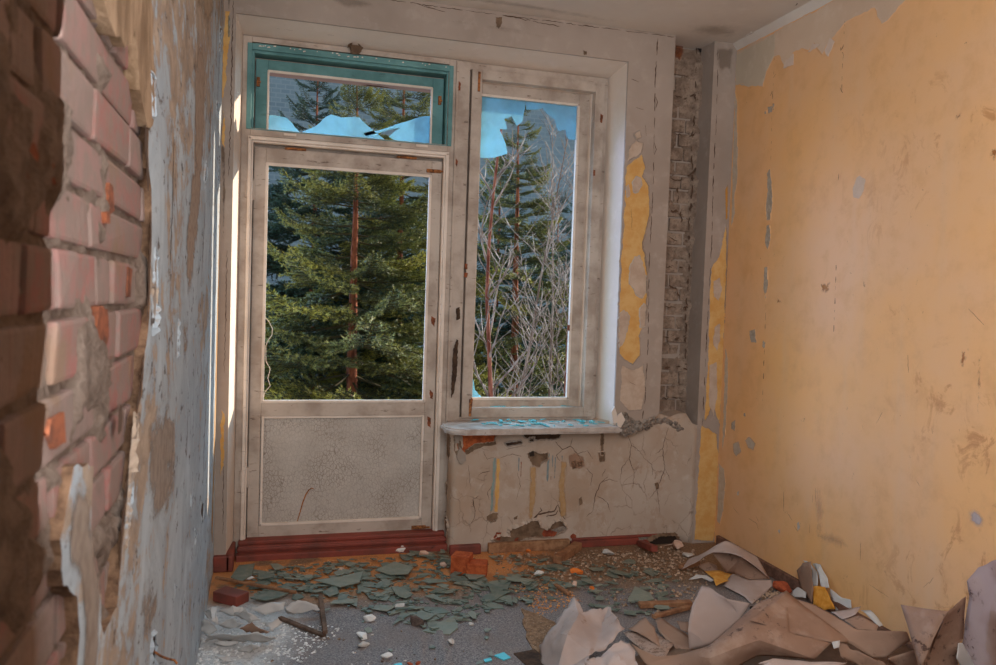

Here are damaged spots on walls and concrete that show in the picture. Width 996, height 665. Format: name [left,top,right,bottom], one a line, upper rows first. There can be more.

flaking render [0,0,165,665]
crack [217,0,234,176]
flaking render [445,433,577,542]
crack [392,0,720,519]
flaking render [597,433,606,463]
flaking render [611,47,703,437]
spalling [644,532,682,545]
peeling [694,0,907,542]